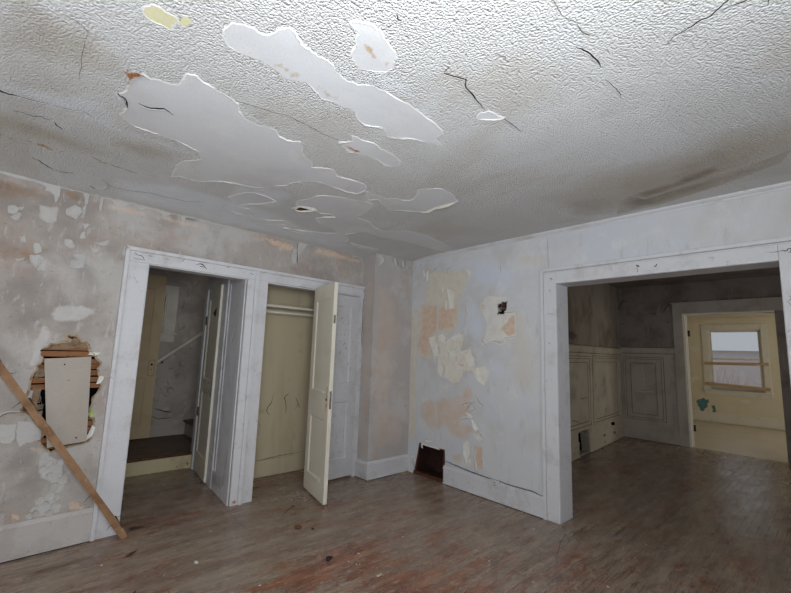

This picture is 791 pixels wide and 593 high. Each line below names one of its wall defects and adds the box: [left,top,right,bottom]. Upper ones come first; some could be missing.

crack [668,0,769,44]
crack [544,0,621,98]
peeling [222,19,444,146]
crack [441,66,485,111]
peeling [113,68,459,214]
crack [503,118,522,132]
flaking render [480,295,516,347]
peeling [429,333,489,386]
spalling [0,333,104,521]